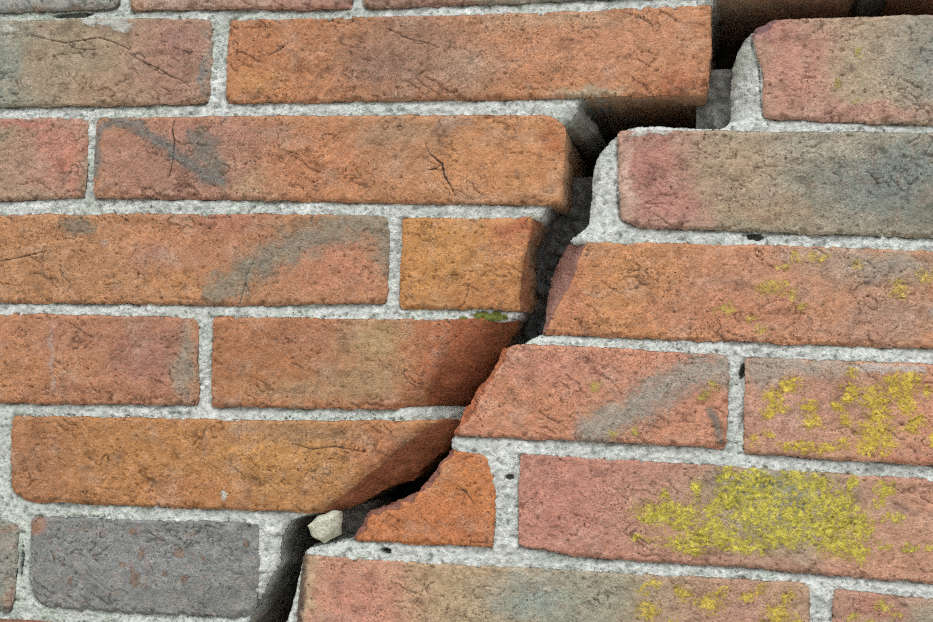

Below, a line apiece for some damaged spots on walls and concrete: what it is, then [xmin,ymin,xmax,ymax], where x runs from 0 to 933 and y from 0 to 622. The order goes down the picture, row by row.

crack [696,45,741,130]
crack [425,144,456,196]
crack [604,136,616,145]
crack [515,164,596,345]
crack [337,474,433,537]